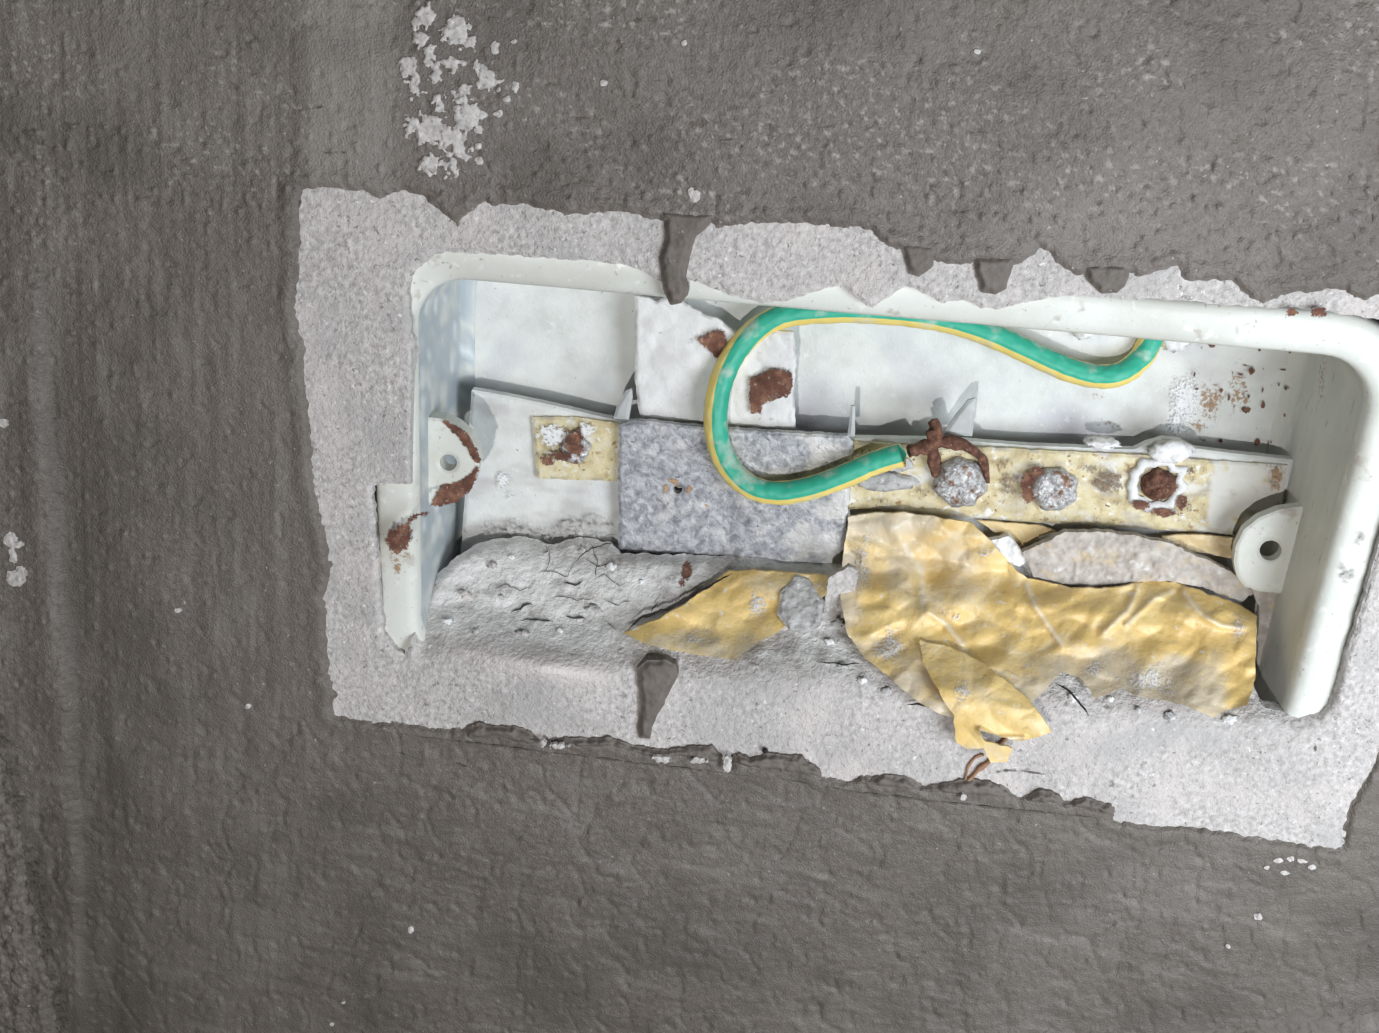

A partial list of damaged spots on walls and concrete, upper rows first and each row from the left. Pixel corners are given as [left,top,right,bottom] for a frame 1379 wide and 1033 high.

peeling [398,1,519,179]
rust [385,421,481,574]
rust [540,427,583,466]
rust [697,331,727,359]
rust [748,369,793,414]
peeling [294,187,1379,875]
rust [998,459,1044,504]
crack [0,719,67,1030]